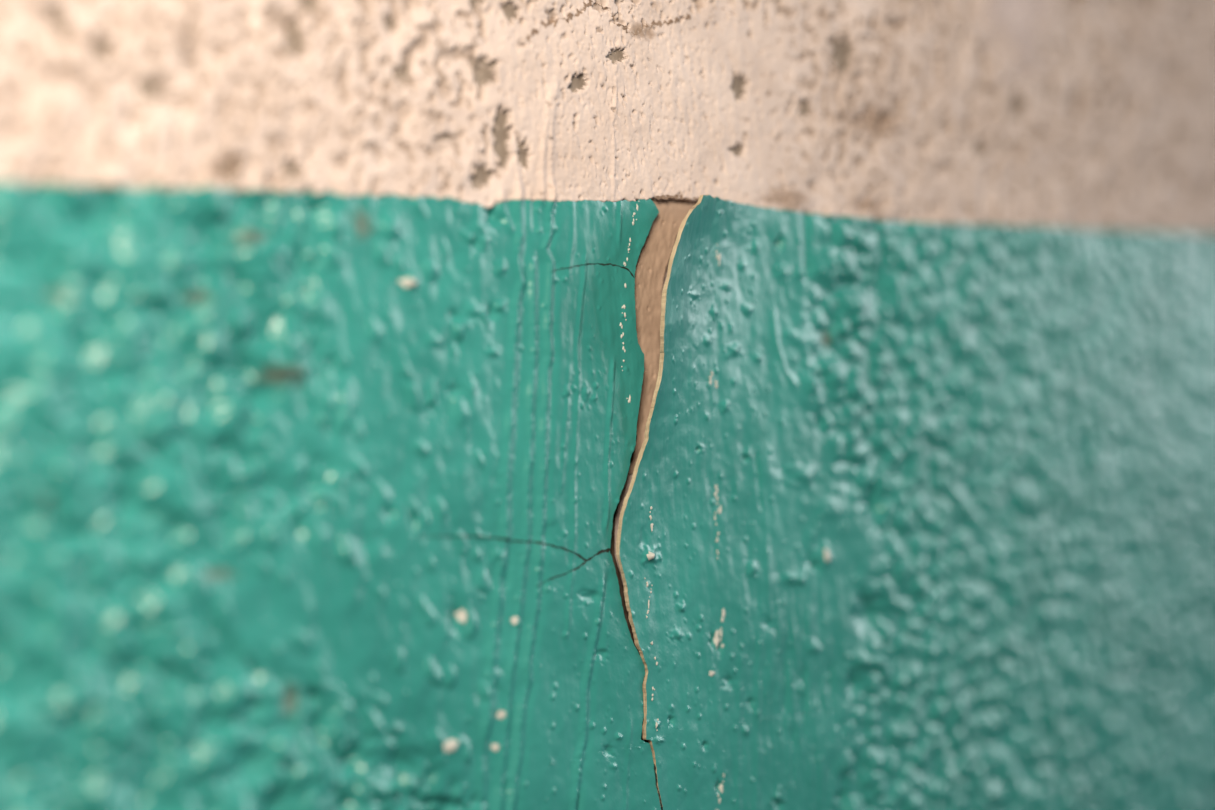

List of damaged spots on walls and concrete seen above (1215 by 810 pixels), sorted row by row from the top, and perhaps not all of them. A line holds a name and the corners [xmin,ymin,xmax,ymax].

crack [553,263,634,277]
crack [417,433,640,655]
crack [641,722,663,810]